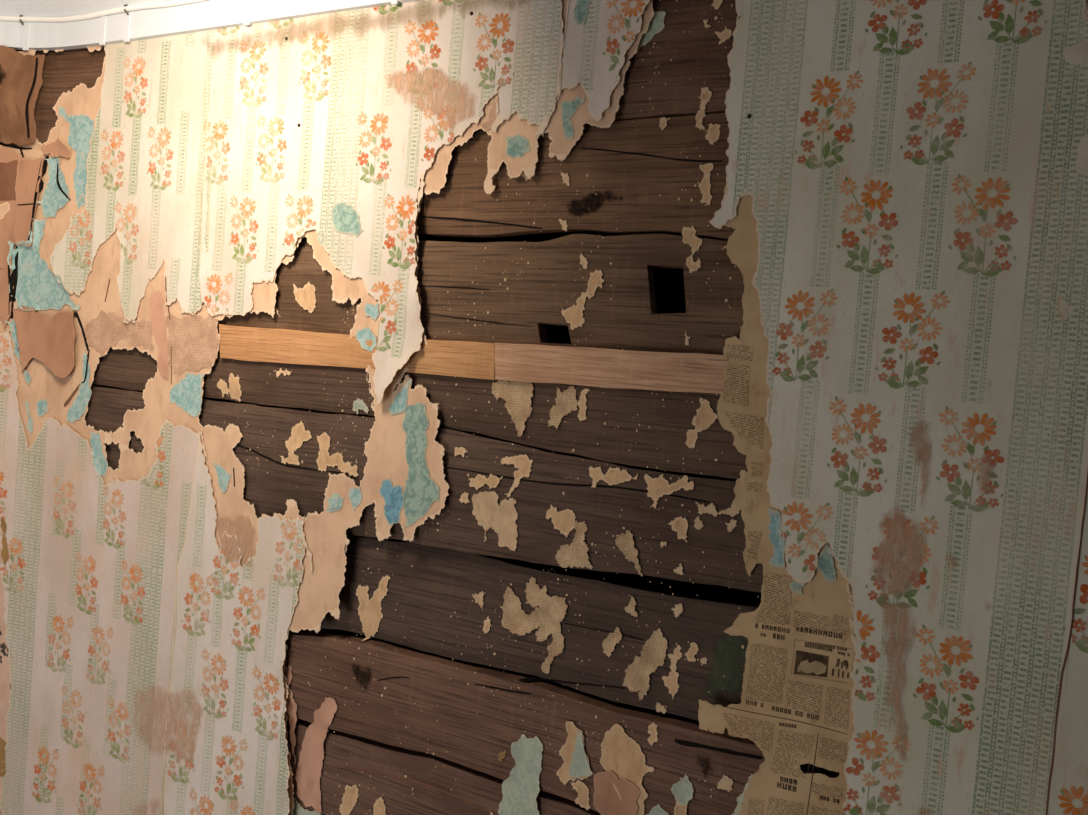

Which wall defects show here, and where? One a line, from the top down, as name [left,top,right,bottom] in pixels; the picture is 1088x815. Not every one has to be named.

crack [421,216,543,229]